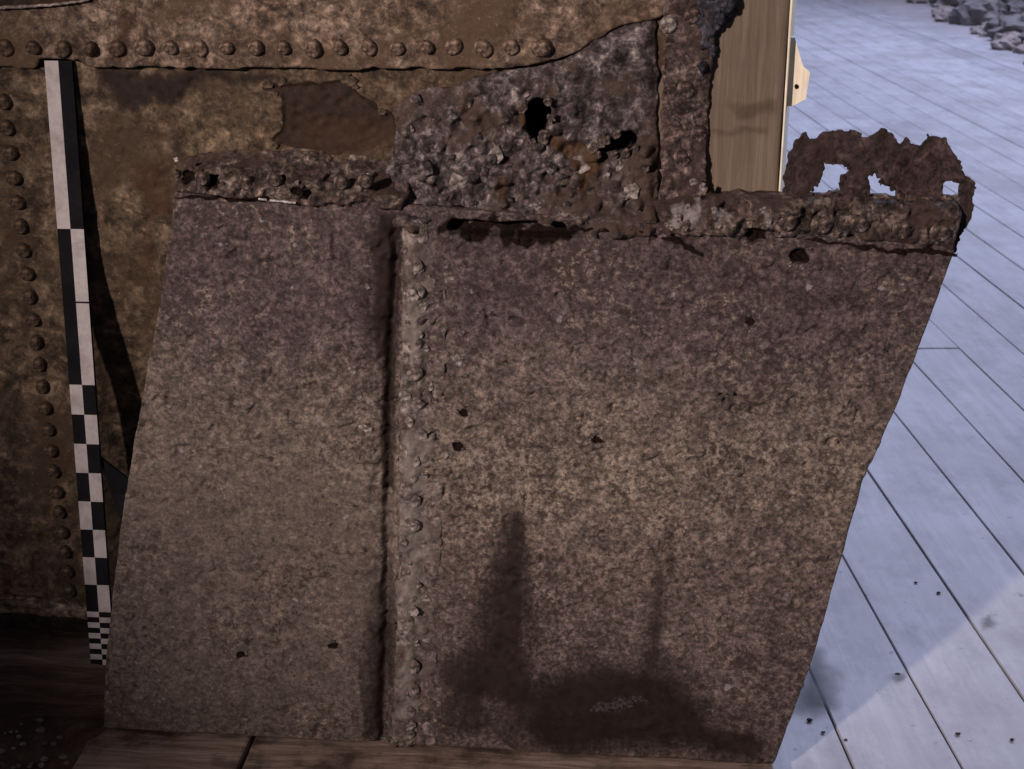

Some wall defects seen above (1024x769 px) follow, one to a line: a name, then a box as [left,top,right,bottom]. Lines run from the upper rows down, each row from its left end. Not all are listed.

spalling [258,18,729,240]
rust [550,135,600,190]
leakage [445,511,761,758]